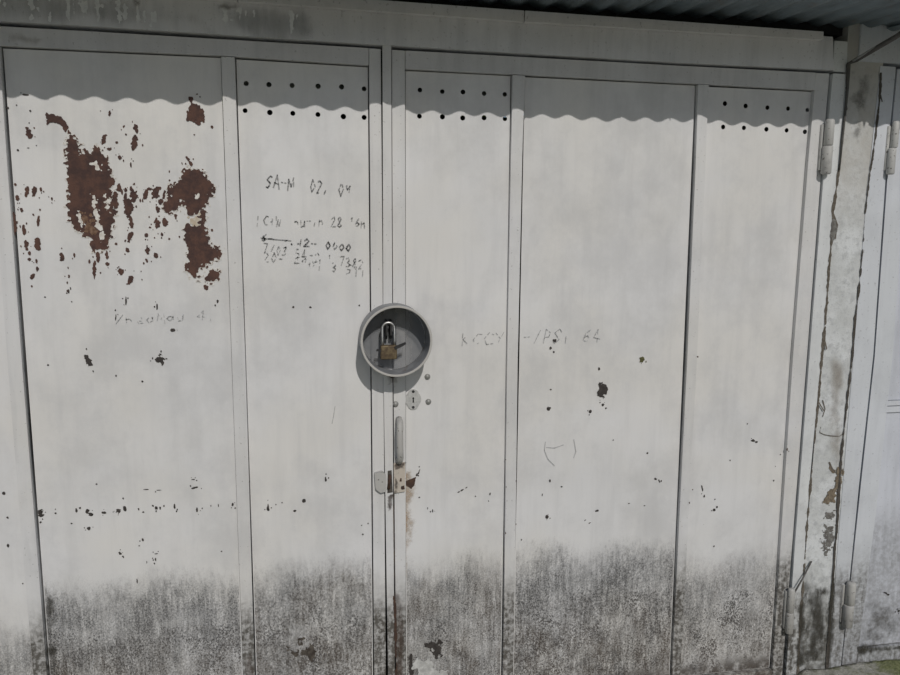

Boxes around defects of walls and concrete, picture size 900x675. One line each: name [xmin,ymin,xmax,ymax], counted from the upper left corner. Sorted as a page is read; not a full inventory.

corrosion [388,464,420,531]
spalling [820,466,844,556]
damp [46,583,242,675]
damp [255,574,372,675]
peeling [408,639,448,675]
damp [407,567,501,675]
damp [514,553,673,675]
damp [680,569,774,675]